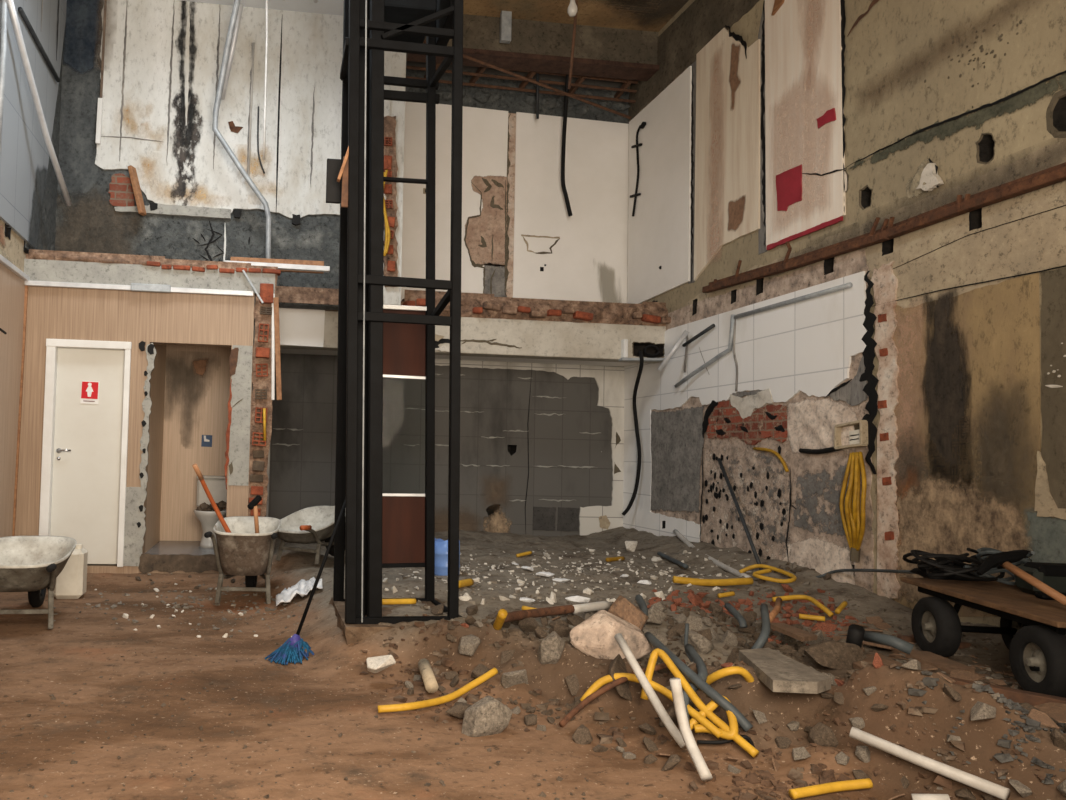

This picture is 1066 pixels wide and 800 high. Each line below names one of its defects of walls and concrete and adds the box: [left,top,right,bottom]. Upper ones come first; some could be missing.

water stain [171,1,203,206]
crack [725,1,766,246]
crack [802,0,1066,212]
flaking render [108,173,135,207]
crack [193,221,226,262]
flaking render [464,176,508,297]
flaking render [483,510,512,533]
flaking render [533,506,579,531]
flaking render [651,356,887,585]
peeling [882,477,1032,603]
water stain [897,292,1066,563]